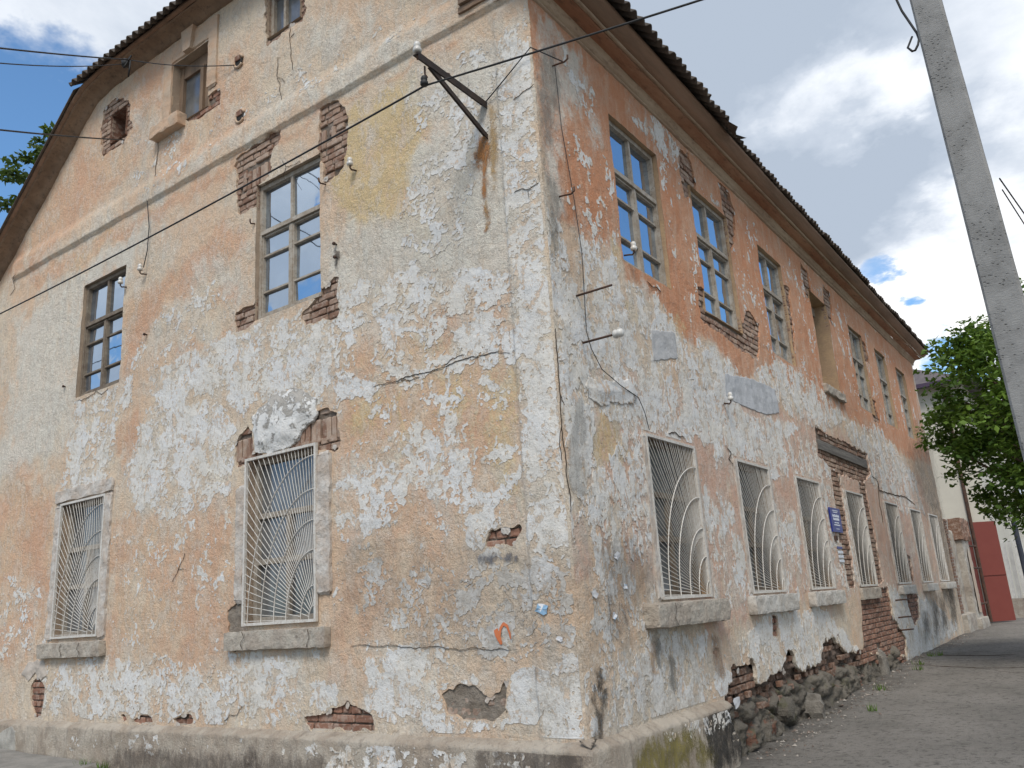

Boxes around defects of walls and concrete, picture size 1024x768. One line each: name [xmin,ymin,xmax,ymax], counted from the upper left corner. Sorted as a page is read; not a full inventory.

corrosion [474,108,497,232]
crack [373,351,507,387]
peeling [101,17,958,739]
crack [555,328,571,512]
peeling [32,648,305,727]
leakage [636,707,742,768]